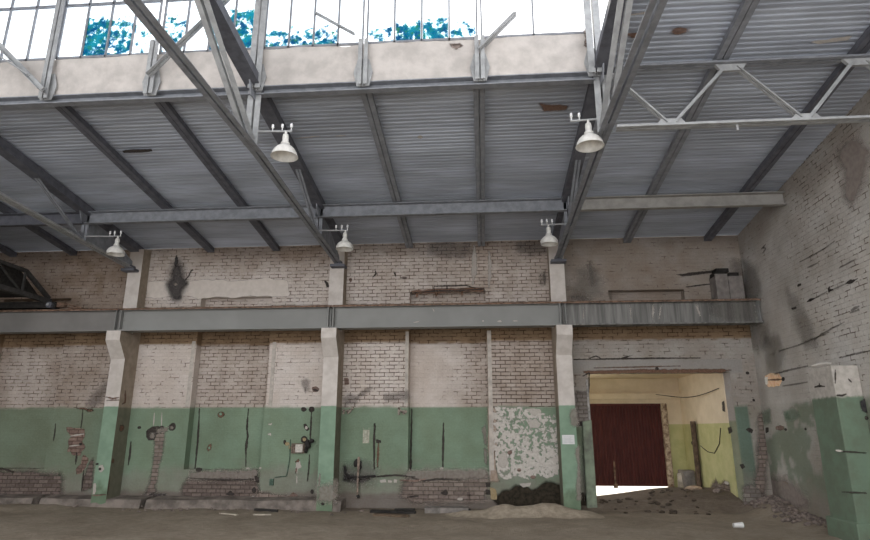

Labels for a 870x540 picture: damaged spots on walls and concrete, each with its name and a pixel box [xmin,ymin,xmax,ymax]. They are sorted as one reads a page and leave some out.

corrosion [540,103,568,111]
flaking render [0,468,63,495]
spalling [66,427,106,496]
crack [193,408,201,469]
flaking render [181,459,301,497]
crack [243,408,251,469]
crack [407,409,415,470]
crack [438,423,446,470]
peeling [380,407,559,503]
flaking render [742,410,798,505]